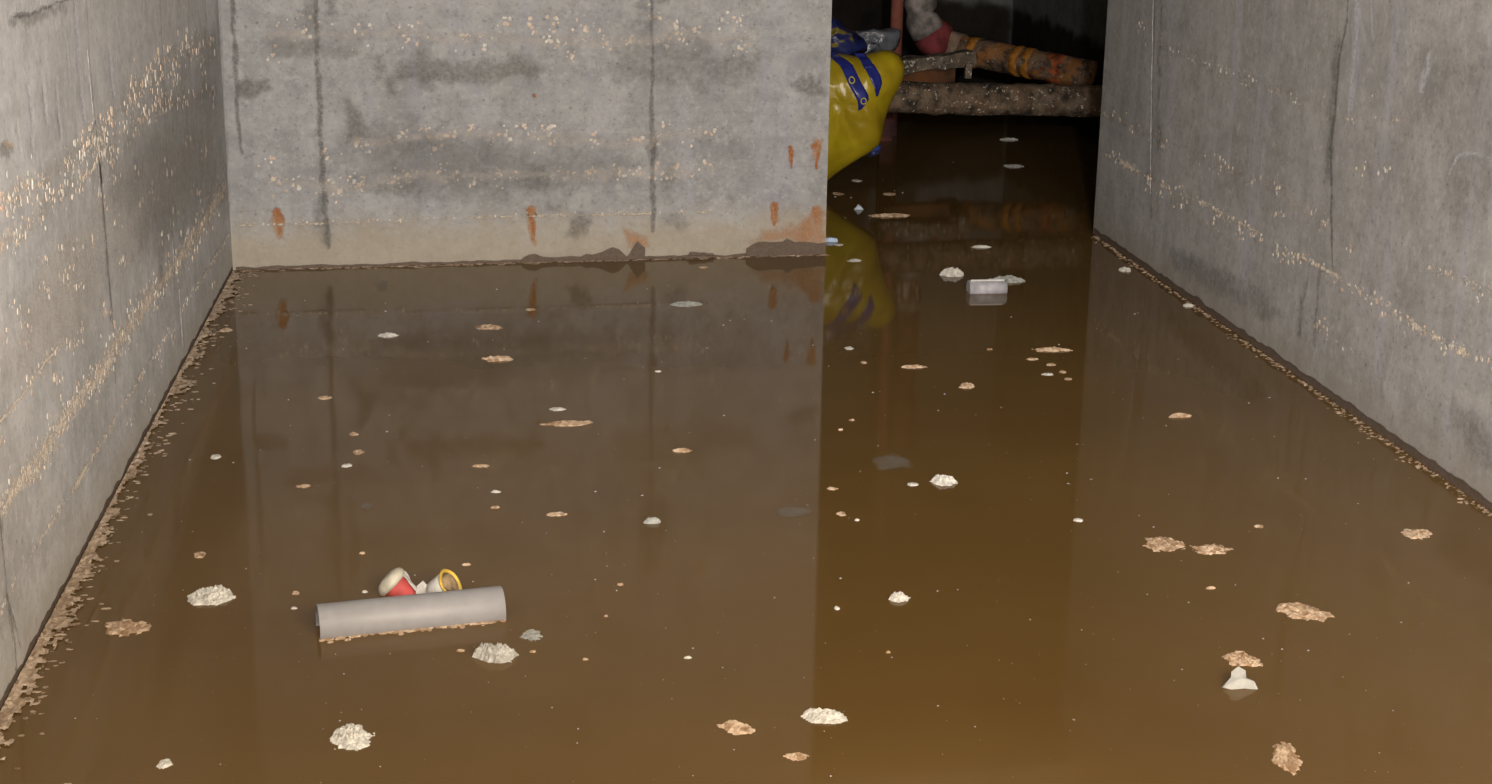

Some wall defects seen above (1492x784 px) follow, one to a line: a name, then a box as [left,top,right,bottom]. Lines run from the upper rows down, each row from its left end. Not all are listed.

crack [231,0,243,154]
rust [273,208,284,234]
crack [315,0,330,246]
rust [527,207,536,245]
rust [766,202,823,241]
rust [811,141,821,169]
damp [1051,116,1492,371]
damp [1094,228,1492,512]